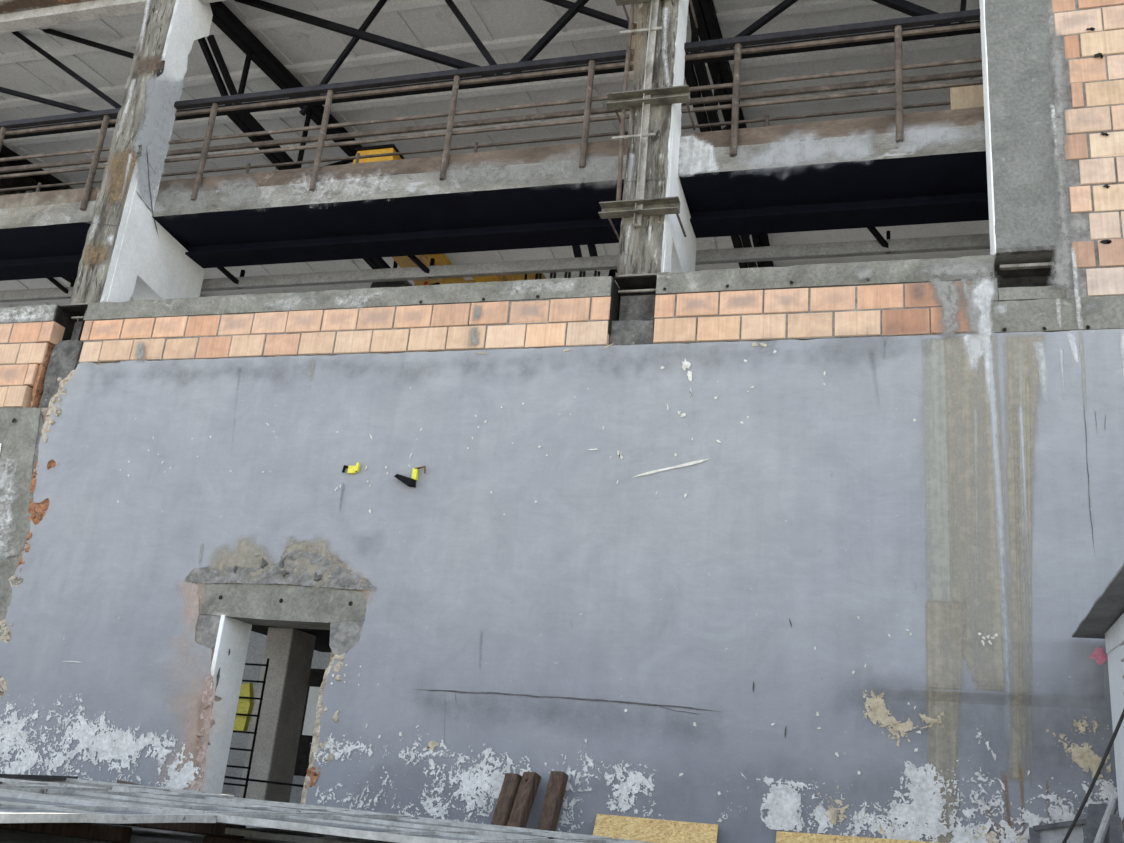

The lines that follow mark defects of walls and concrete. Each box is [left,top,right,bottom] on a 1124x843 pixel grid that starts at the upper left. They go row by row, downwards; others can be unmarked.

corrosion [108,149,137,203]
leakage [1050,34,1100,407]
spalling [41,370,75,443]
spalling [8,460,59,587]
spalling [185,539,376,590]
leakage [922,262,1045,843]
peeling [300,653,531,824]
crack [416,689,721,714]
peeling [544,739,664,839]
peeling [741,690,1119,843]